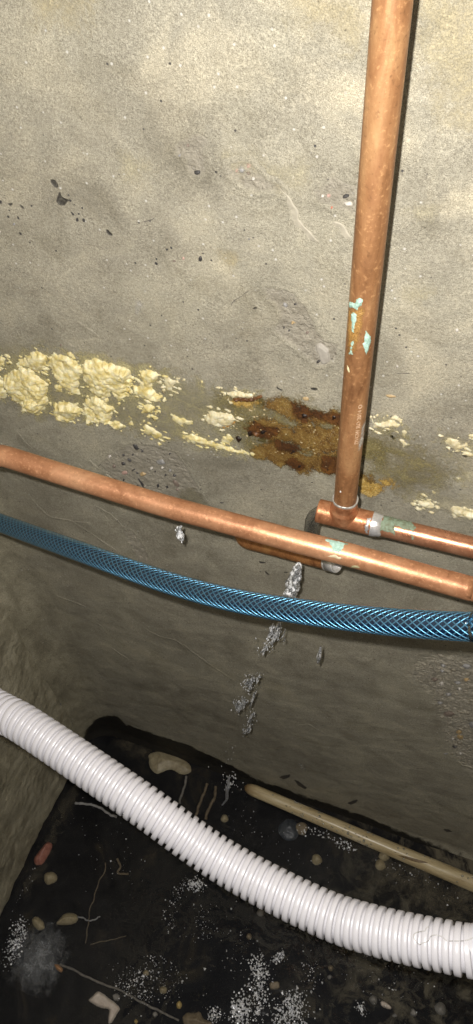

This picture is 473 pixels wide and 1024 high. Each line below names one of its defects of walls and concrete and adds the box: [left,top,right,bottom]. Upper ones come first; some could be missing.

water stain [0,347,256,456]
corrosion [217,395,340,475]
water stain [368,414,410,448]
water stain [438,434,473,482]
water stain [410,490,473,520]